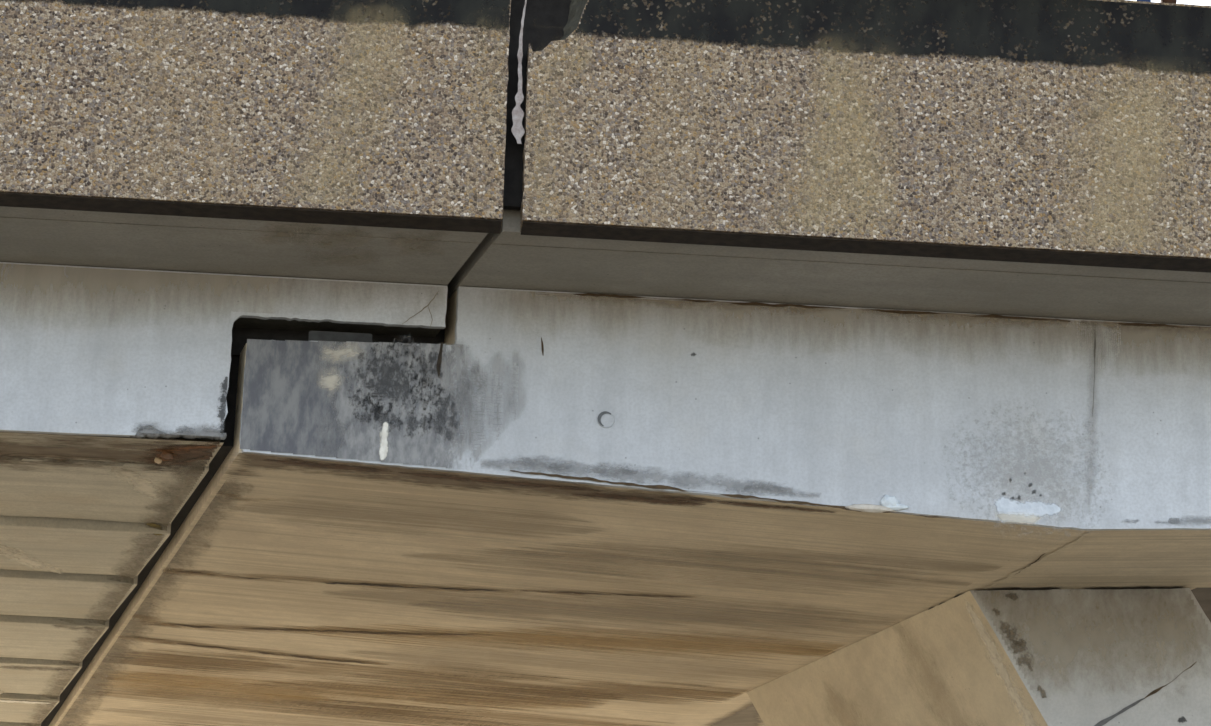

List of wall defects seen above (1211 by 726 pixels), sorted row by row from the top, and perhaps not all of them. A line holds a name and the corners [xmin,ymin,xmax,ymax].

spalling [561,0,588,40]
leakage [0,437,216,472]
rust [141,442,221,470]
leakage [231,336,909,513]
crack [928,532,1185,610]
crack [1094,661,1197,726]